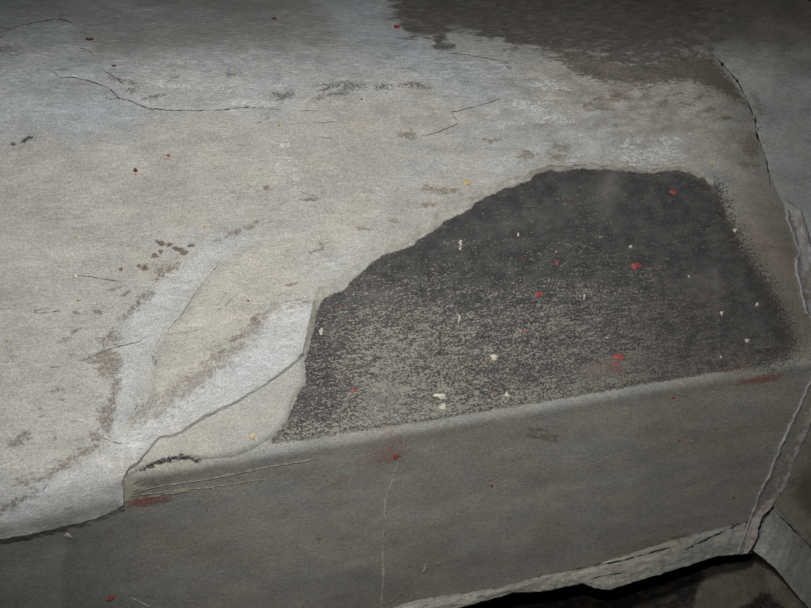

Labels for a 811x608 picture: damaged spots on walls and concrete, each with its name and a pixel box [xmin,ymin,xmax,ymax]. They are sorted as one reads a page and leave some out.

crack [56,69,204,111]
crack [411,98,503,140]
efflorescence [486,100,575,134]
damp [390,0,755,109]
crack [714,55,771,186]
spalling [123,163,804,501]
spalling [393,522,750,608]